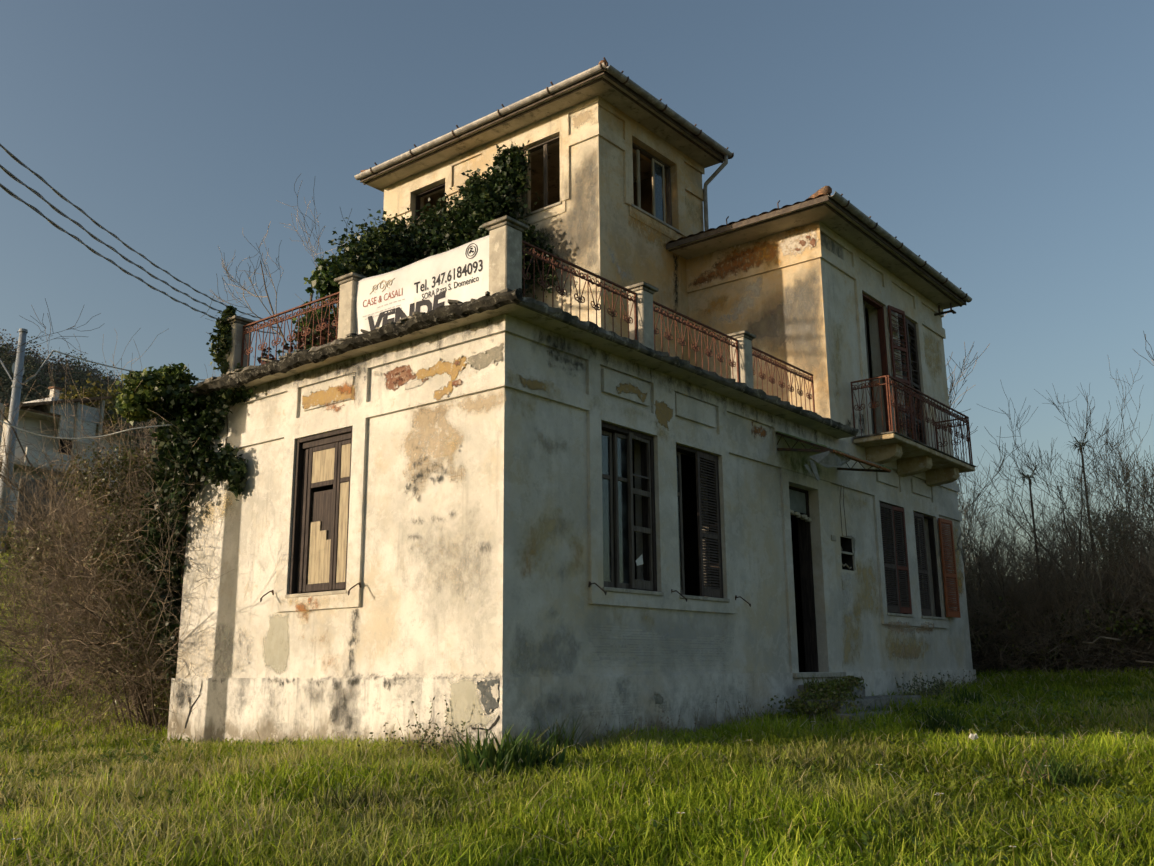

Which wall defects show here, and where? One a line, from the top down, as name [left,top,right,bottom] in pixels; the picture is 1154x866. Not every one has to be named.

leakage [533,153,598,267]
flaking render [693,227,819,285]
leakage [748,271,837,382]
flaking render [301,383,355,412]
flaking render [374,343,505,500]
flaking render [617,380,673,432]
leakage [308,609,409,729]
flaking render [476,677,500,715]